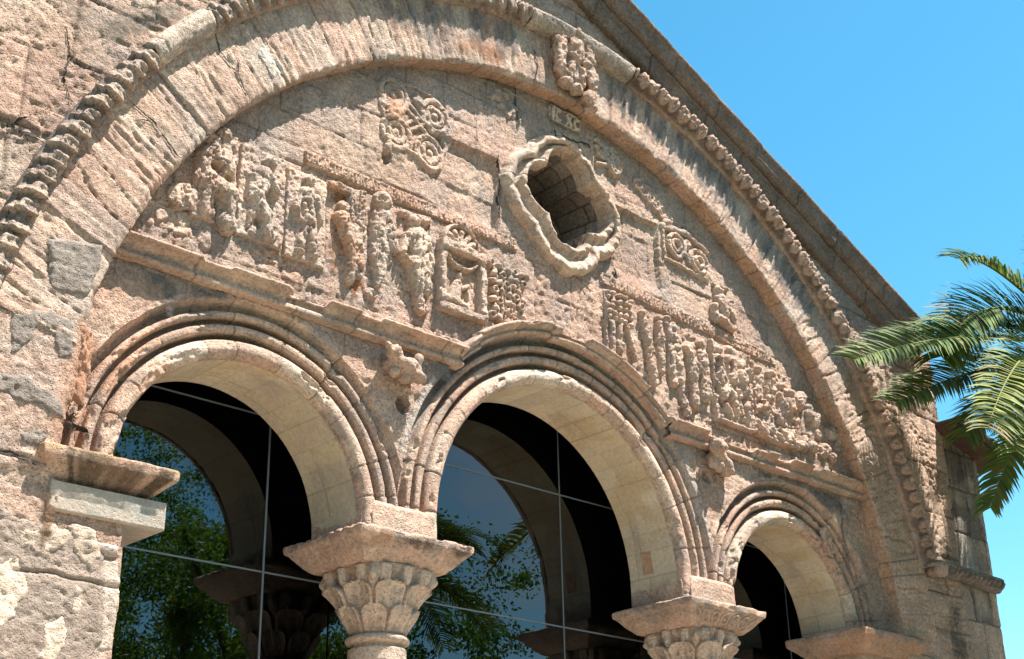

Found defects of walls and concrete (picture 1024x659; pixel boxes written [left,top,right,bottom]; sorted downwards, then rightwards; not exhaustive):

crack [62,28,80,101]
crack [130,101,181,158]